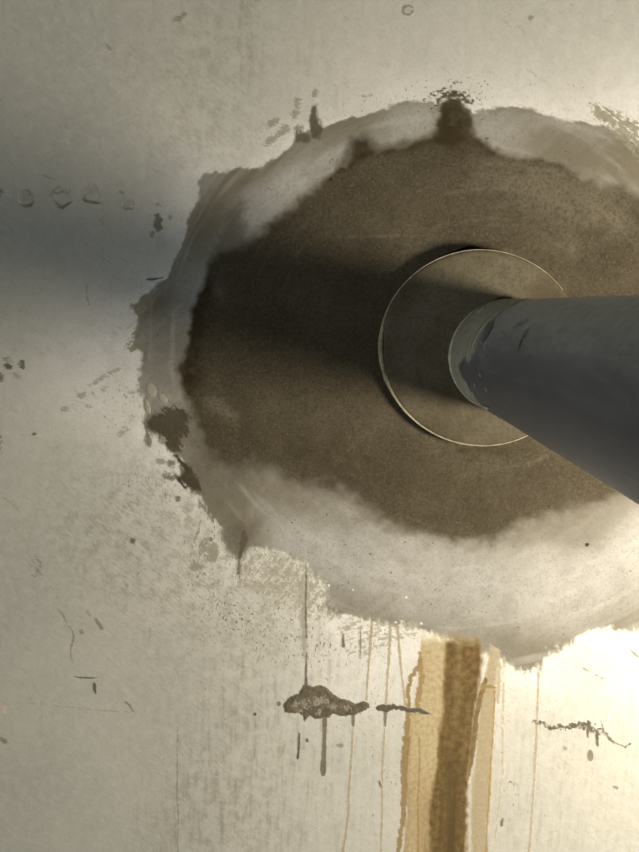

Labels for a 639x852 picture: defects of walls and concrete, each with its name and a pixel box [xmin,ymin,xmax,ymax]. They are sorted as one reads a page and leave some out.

peeling [265,98,304,147]
peeling [150,204,171,237]
leakage [146,81,639,544]
peeling [145,433,167,447]
peeling [157,458,176,481]
peeling [190,537,220,572]
corrosion [385,624,505,852]
crack [532,720,631,761]